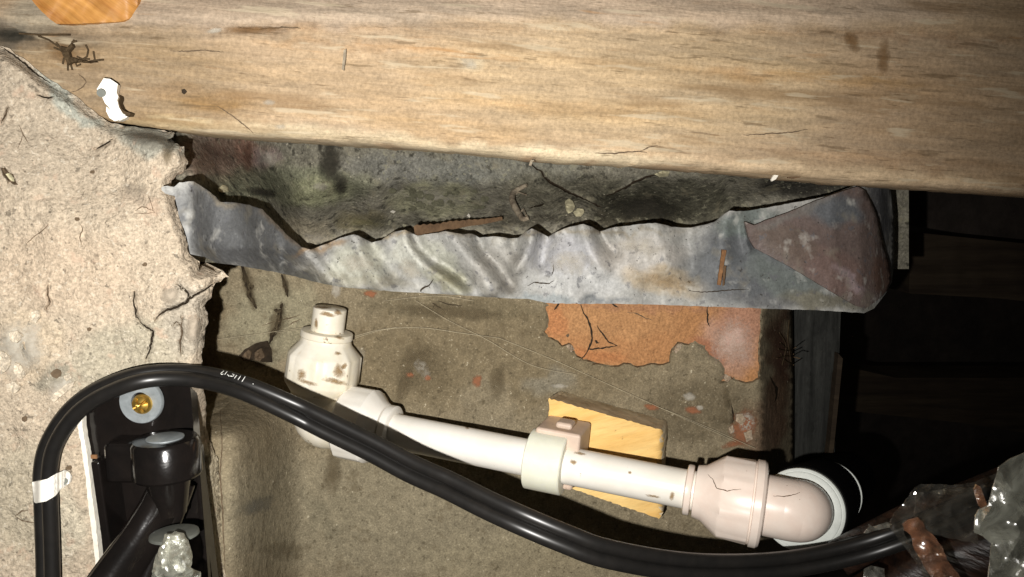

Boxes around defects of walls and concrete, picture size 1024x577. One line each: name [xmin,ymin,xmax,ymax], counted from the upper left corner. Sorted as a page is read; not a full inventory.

spalling [1,168,18,185]
damp [335,176,346,194]
crack [133,282,215,359]
flaking render [545,303,761,382]